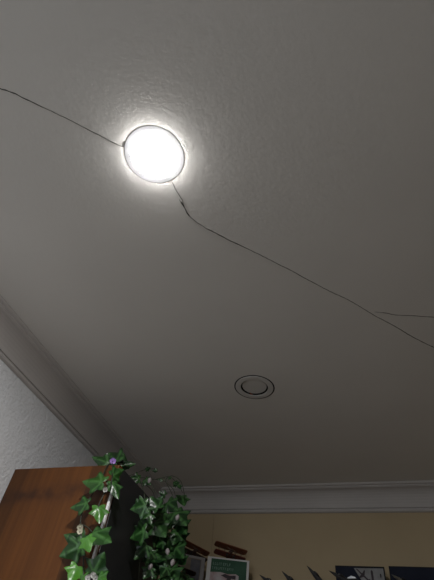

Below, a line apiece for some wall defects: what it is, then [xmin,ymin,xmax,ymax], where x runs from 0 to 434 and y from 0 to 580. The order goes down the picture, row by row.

crack [0,88,125,147]
crack [172,182,434,348]